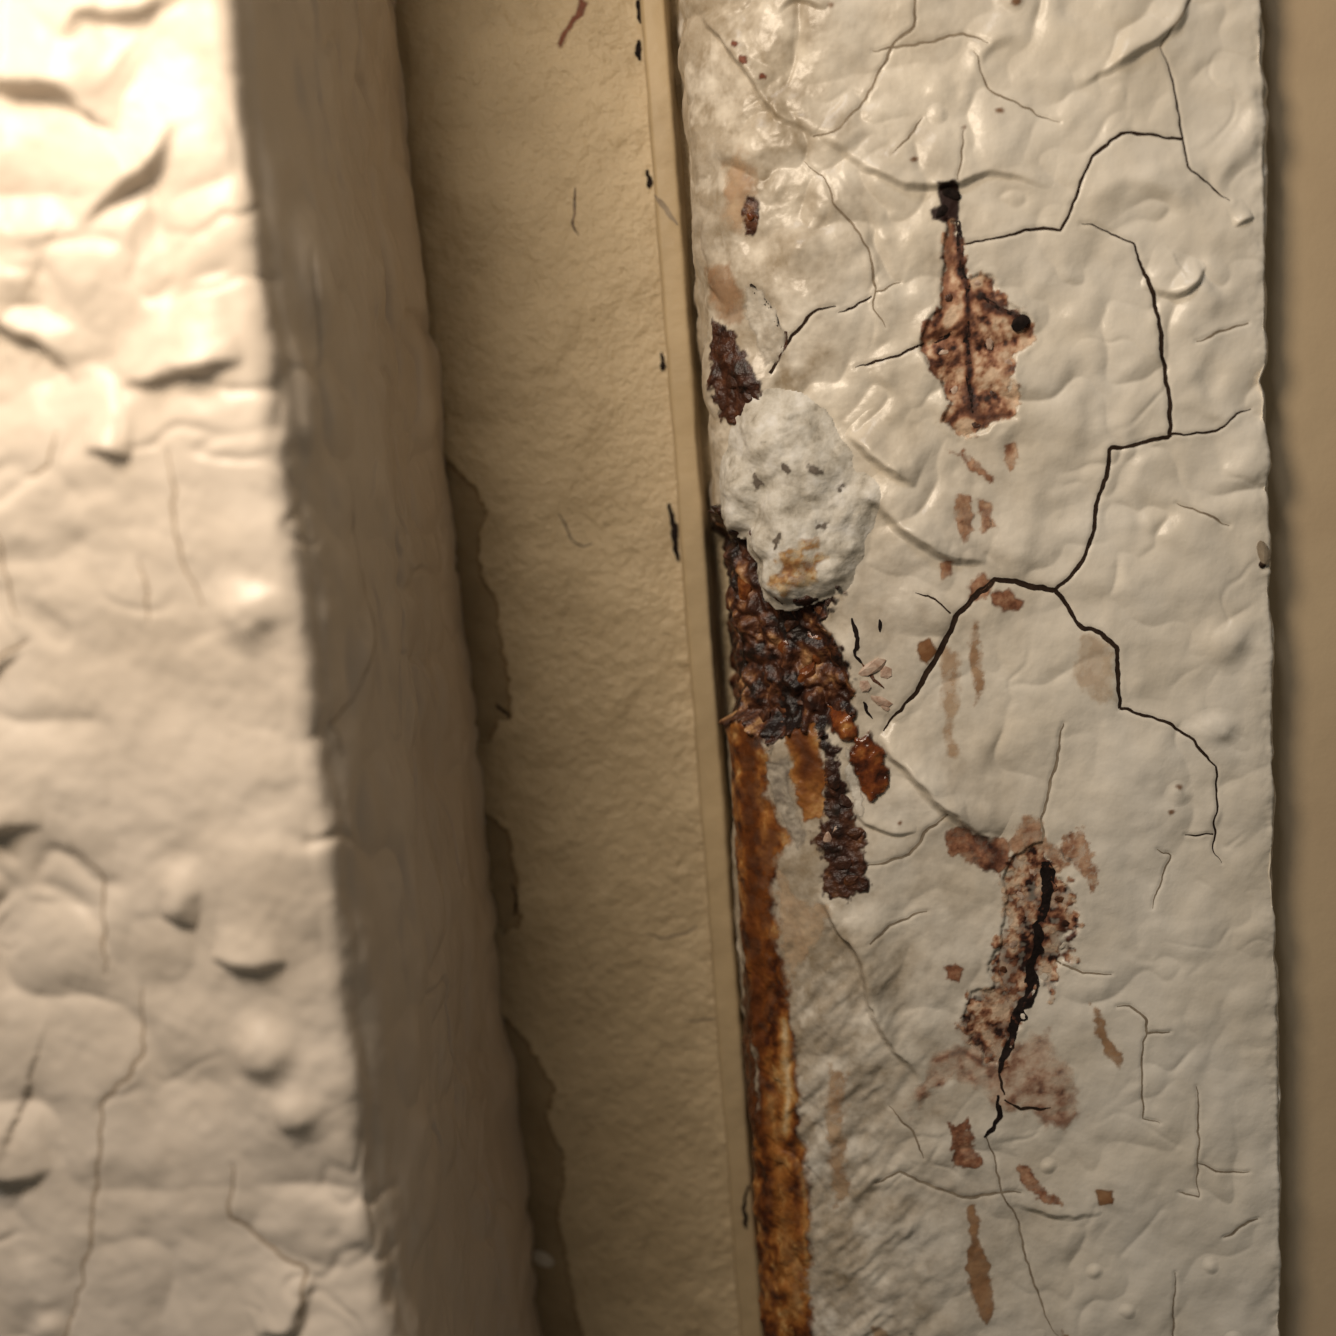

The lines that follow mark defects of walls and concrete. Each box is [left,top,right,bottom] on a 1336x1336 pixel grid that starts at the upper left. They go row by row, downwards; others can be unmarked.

crack [769,0,1058,374]
corrosion [707,266,762,425]
crack [883,0,1251,908]
peeling [445,460,511,743]
peeling [485,816,523,933]
peeling [504,1019,583,1336]
corrosion [708,505,890,1336]
crack [870,911,927,945]
crack [867,814,948,866]
spalling [916,816,1098,1138]
crack [1117,1005,1168,1123]
crack [1180,1086,1246,1198]